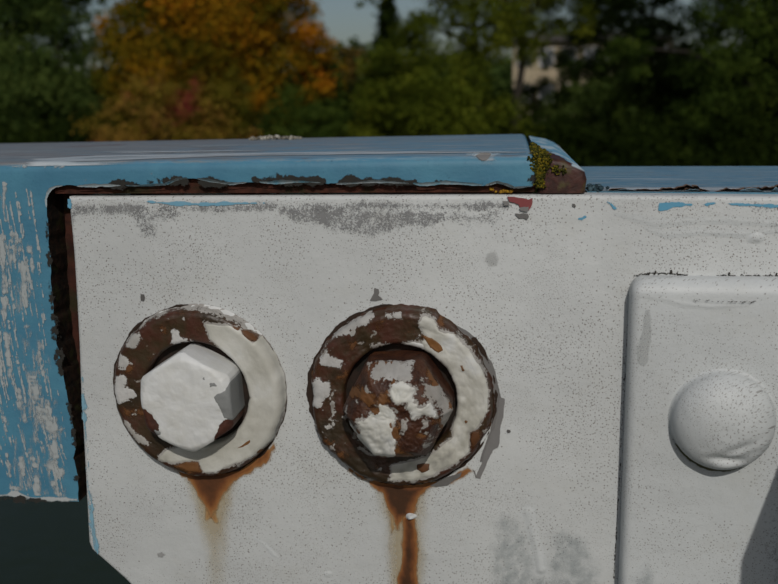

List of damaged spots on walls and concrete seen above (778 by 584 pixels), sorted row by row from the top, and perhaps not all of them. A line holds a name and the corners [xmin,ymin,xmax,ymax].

peeling [71,178,247,236]
rust [64,194,81,373]
peeling [48,286,65,376]
spalling [0,491,77,504]
rust [174,444,275,531]
rust [349,468,438,584]